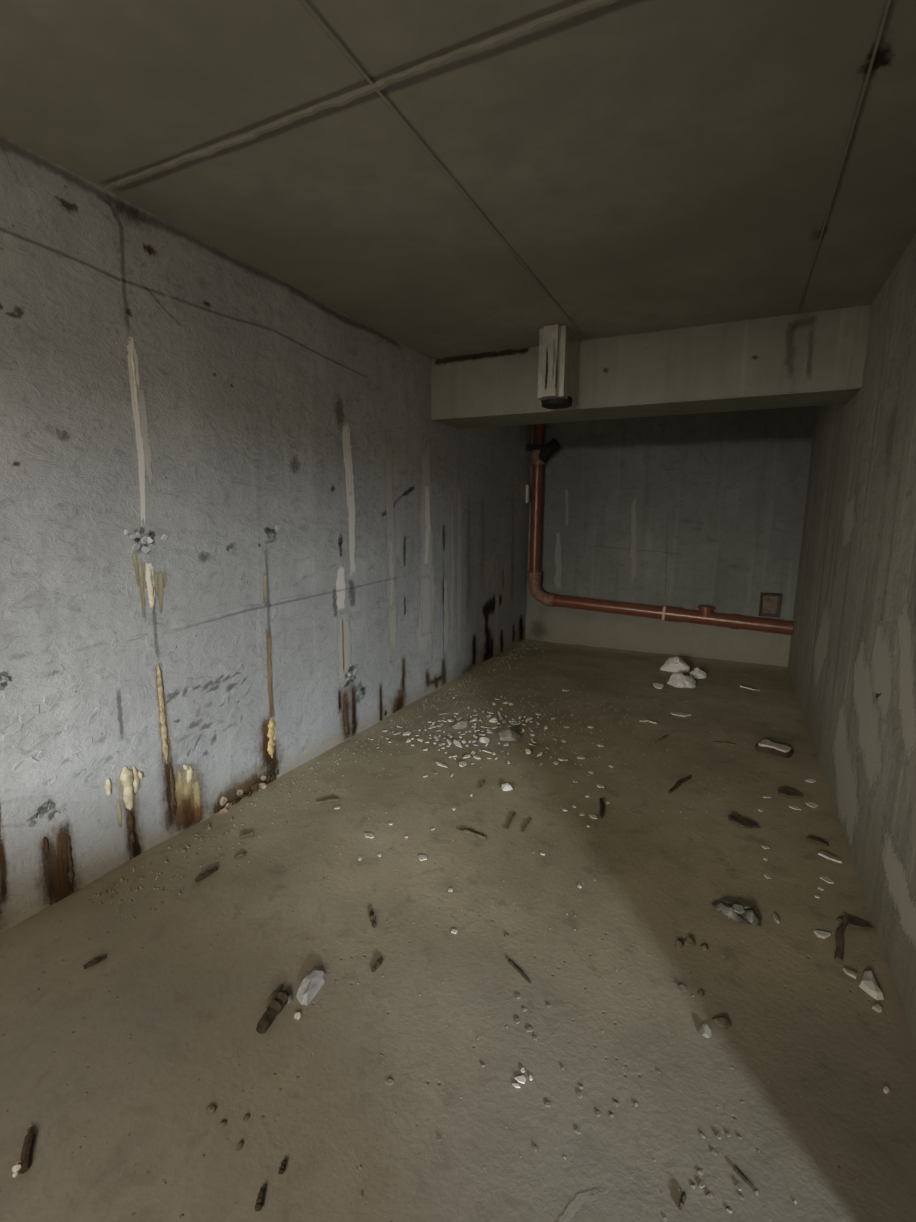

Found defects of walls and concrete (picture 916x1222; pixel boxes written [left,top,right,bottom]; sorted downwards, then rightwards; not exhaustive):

spalling [124,527,168,553]
rust [132,552,167,617]
rust [336,537,356,738]
rust [380,660,405,720]
rust [156,662,202,830]
rust [105,766,144,858]
rust [42,827,75,903]